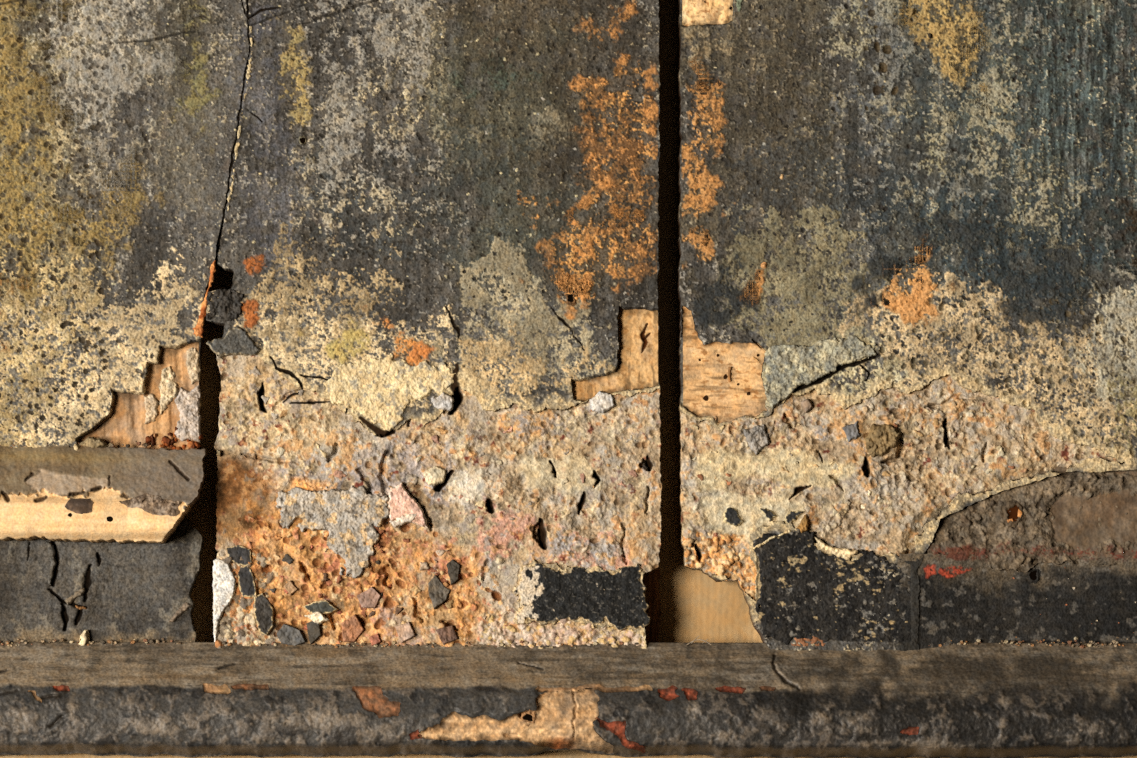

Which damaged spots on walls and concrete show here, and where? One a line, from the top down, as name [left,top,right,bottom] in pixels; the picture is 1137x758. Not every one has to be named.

corrosion [601,1,637,40]
peeling [682,0,743,26]
crack [218,0,280,246]
corrosion [537,54,658,319]
corrosion [682,58,726,261]
corrosion [870,239,938,325]
crack [779,356,876,403]
spalling [78,289,662,649]
crack [27,541,101,631]